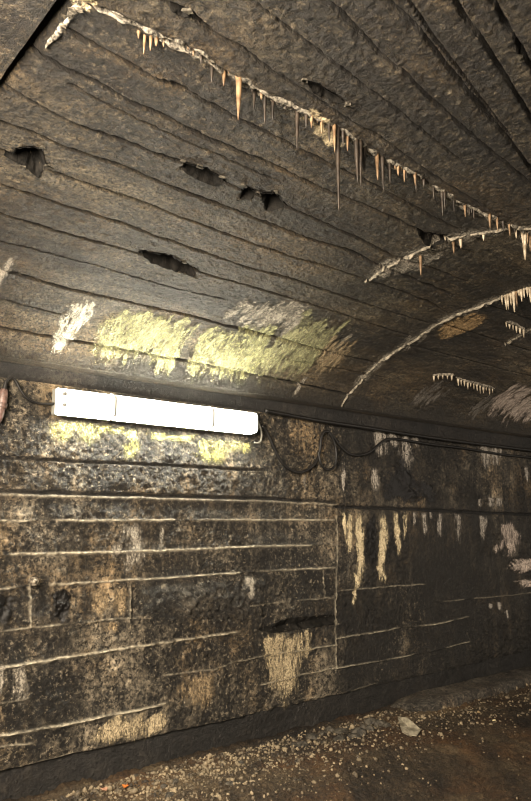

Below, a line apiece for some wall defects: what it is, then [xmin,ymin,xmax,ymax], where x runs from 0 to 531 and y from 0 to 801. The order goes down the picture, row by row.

spalling [4,145,54,178]
spalling [180,159,226,187]
spalling [235,183,287,211]
damp [73,0,531,283]
spalling [138,250,200,280]
damp [52,298,95,353]
damp [89,309,357,394]
damp [341,286,531,407]
damp [412,373,531,422]
damp [371,432,436,502]
damp [342,512,442,605]
damp [263,630,314,698]